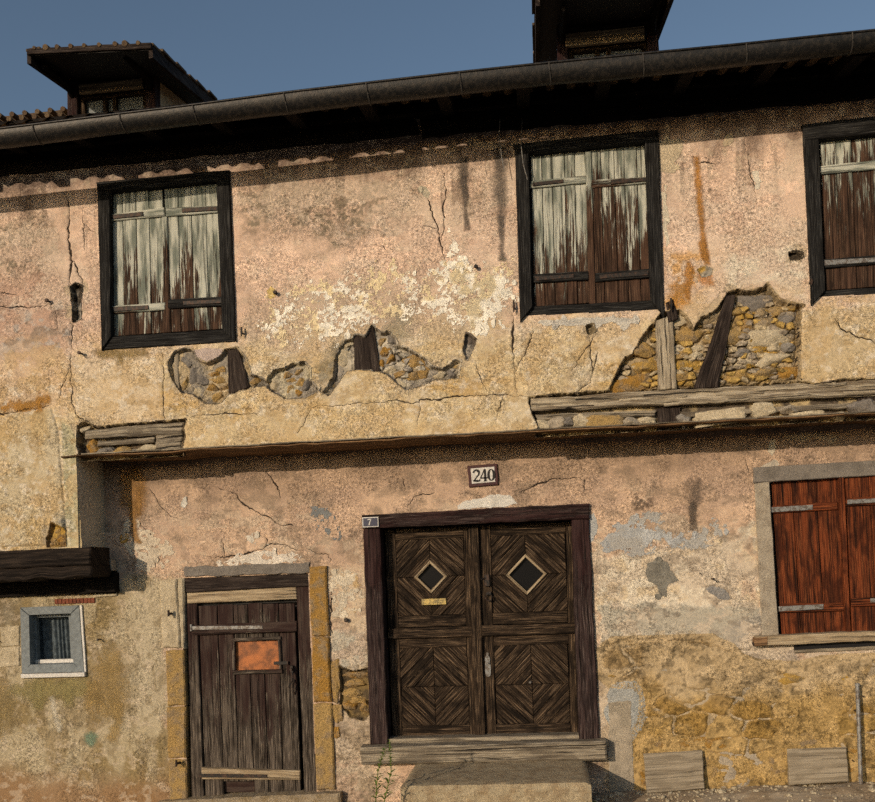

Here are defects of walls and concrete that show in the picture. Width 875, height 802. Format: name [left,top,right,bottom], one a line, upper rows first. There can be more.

crack [0,292,96,427]
crack [67,200,94,302]
flaking render [167,218,519,404]
crack [423,173,447,266]
damp [459,158,470,230]
damp [494,145,506,260]
corrosion [672,262,713,307]
flaking render [528,281,875,467]
corrosion [695,157,710,264]
corrosion [121,466,146,543]
crack [206,488,331,562]
flaking render [589,511,730,600]